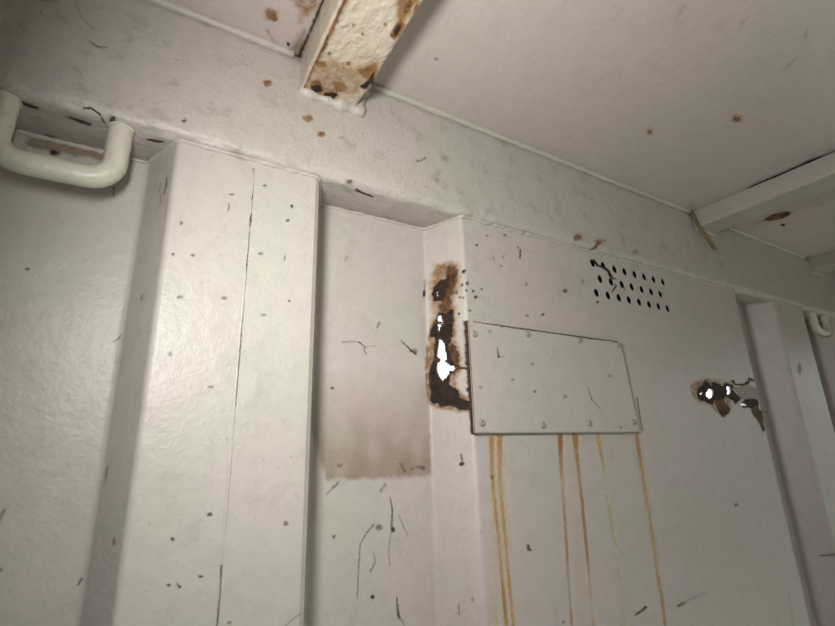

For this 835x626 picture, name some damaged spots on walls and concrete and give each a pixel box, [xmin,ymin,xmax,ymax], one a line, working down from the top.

corrosion [304,0,347,99]
corrosion [343,62,377,89]
peeling [429,266,470,410]
peeling [697,381,765,431]
corrosion [572,434,580,471]
corrosion [635,434,647,497]
corrosion [489,435,514,626]
corrosion [580,487,589,563]